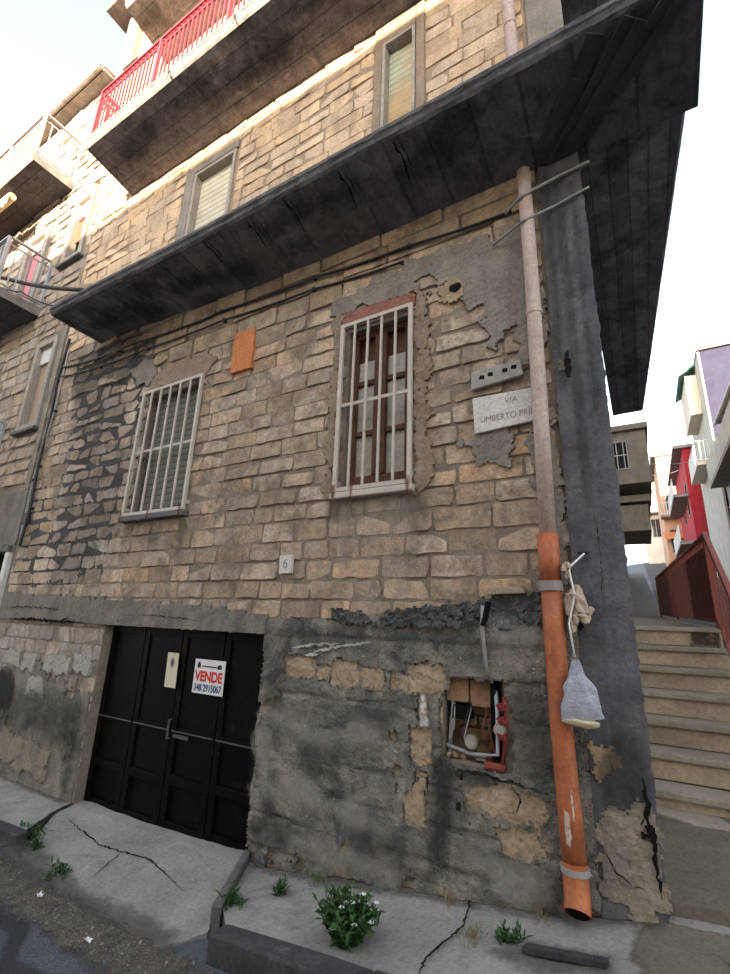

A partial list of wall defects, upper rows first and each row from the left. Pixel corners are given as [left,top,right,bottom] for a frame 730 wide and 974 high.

crack [392,141,412,182]
peeling [319,220,537,501]
peeling [11,331,161,588]
leakage [292,642,371,657]
leakage [420,695,428,727]
flaking render [587,741,622,783]
crack [70,821,183,891]
flaking render [460,779,554,868]
peeling [564,790,575,849]
flaking render [594,797,673,924]
crack [606,777,662,899]
crack [419,900,471,974]